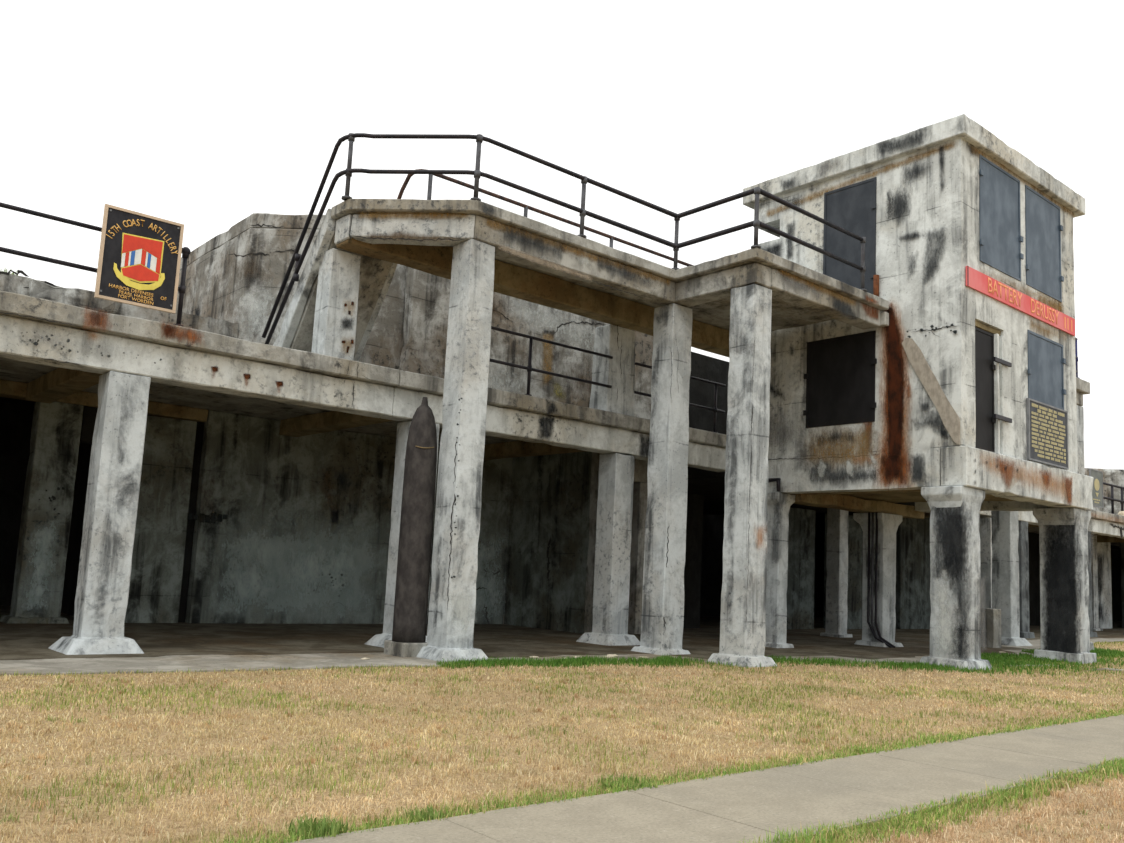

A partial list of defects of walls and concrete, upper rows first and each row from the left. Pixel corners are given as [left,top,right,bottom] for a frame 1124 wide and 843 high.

leakage [483,206,669,284]
leakage [762,224,856,318]
leakage [767,129,954,282]
corrosion [162,323,197,342]
corrosion [856,297,910,484]
corrosion [975,460,1072,503]
leakage [933,501,985,660]